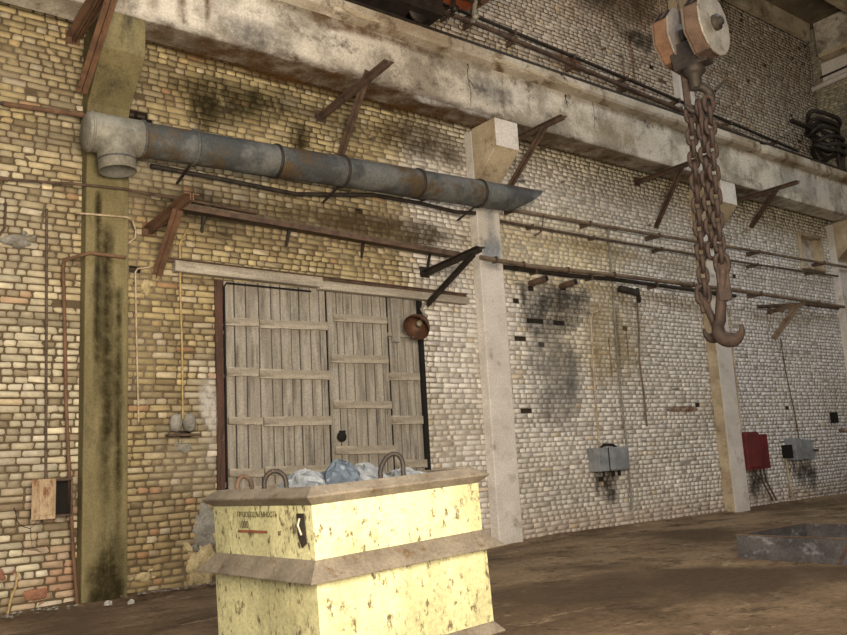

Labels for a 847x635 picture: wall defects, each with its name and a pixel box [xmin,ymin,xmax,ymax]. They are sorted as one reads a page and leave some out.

damp [95,195,121,487]
damp [91,549,123,602]
spalling [182,503,216,585]